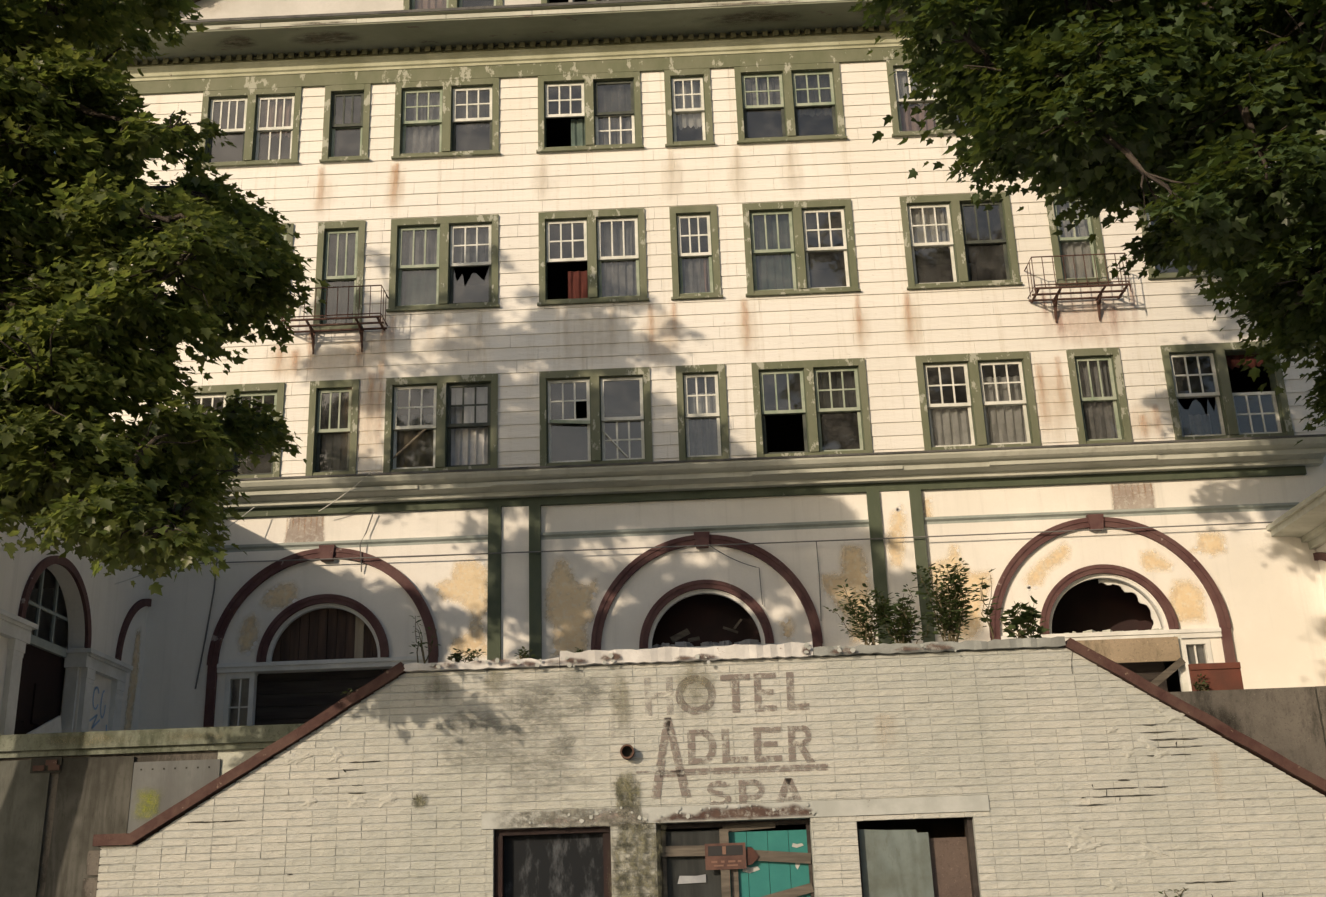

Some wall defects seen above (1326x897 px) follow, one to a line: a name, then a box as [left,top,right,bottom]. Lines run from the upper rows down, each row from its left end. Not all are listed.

peeling [430,556,621,669]
peeling [823,547,872,653]
peeling [886,499,933,565]
peeling [1025,542,1067,591]
peeling [1140,550,1209,622]